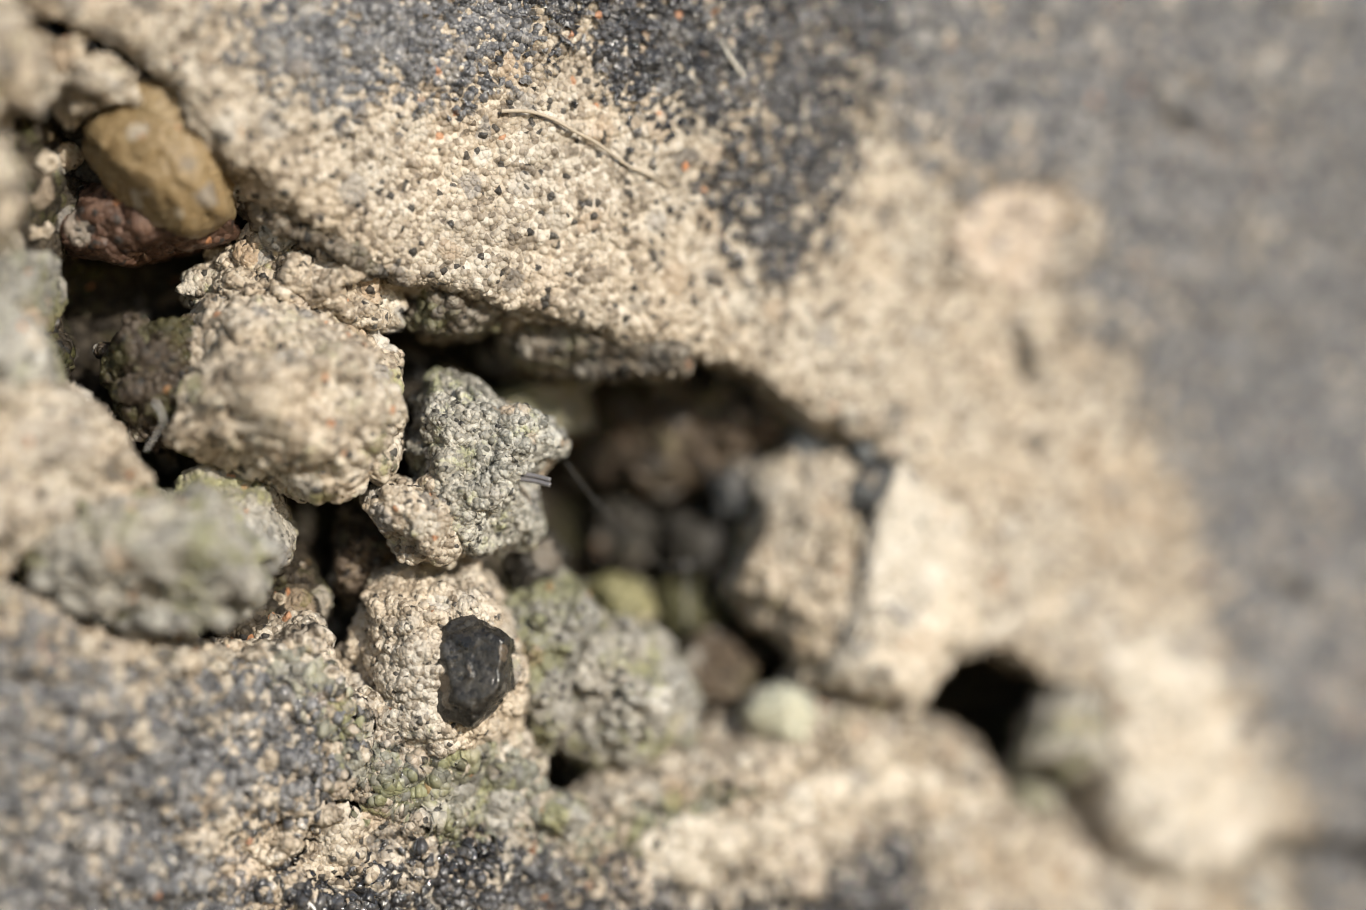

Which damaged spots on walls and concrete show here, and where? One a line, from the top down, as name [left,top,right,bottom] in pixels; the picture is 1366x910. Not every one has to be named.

spalling [32,18,71,35]
spalling [89,38,140,70]
spalling [234,196,389,282]
peeling [946,172,1069,296]
spalling [0,105,205,492]
hole [1008,332,1035,376]
spalling [381,288,792,688]
spalling [9,569,19,586]
spalling [62,611,108,625]
spalling [198,481,373,649]
spalling [546,750,586,791]
spalling [919,651,1074,818]